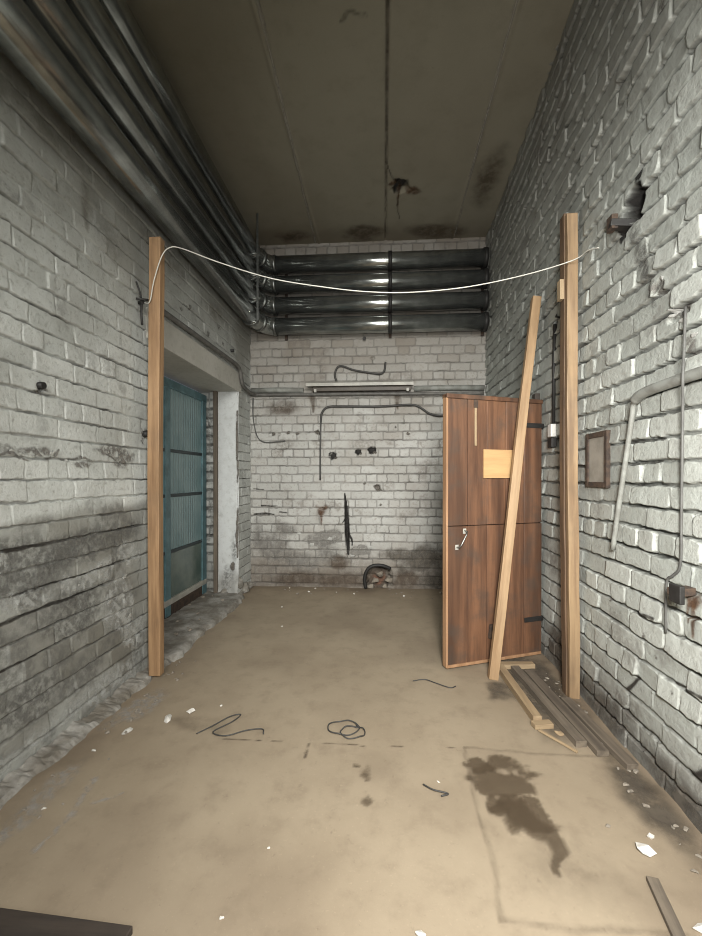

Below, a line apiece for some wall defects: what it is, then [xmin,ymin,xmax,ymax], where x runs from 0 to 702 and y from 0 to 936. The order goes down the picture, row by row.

spalling [618,170,649,243]
water stain [467,755,567,874]